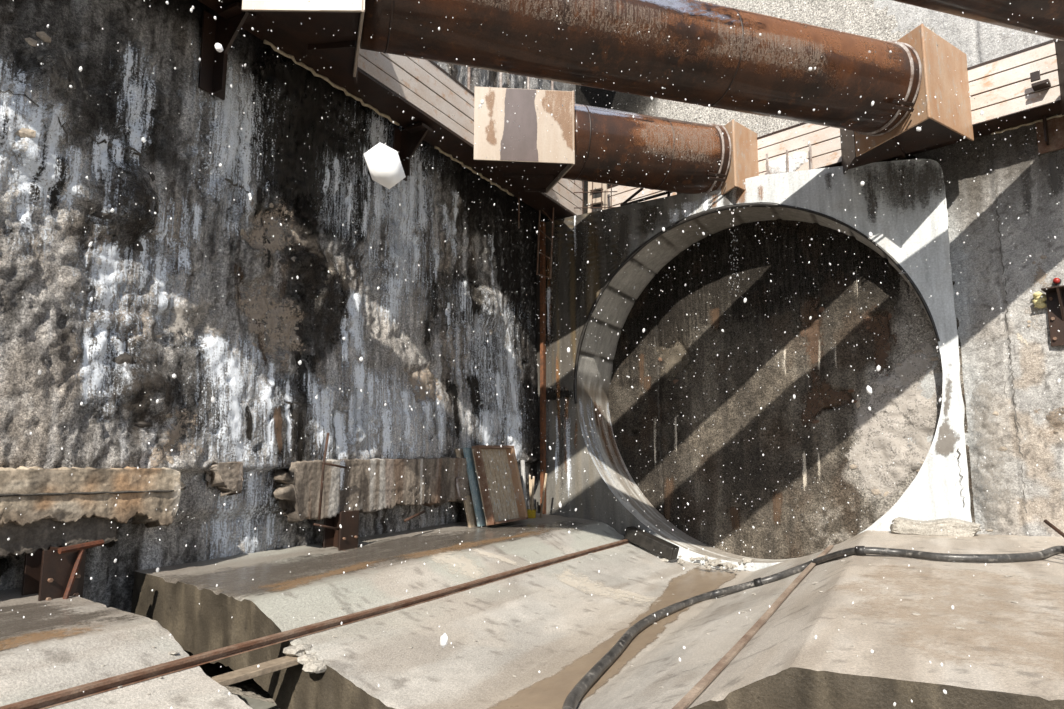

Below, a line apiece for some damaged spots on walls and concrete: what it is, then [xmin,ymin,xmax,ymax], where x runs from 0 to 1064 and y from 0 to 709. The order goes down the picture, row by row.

damp [853,160,945,223]
damp [1019,151,1032,213]
spalling [240,197,308,278]
damp [0,41,582,597]
damp [619,190,924,391]
crack [994,161,1027,513]
damp [546,386,621,503]
damp [802,453,821,490]
damp [559,567,660,603]